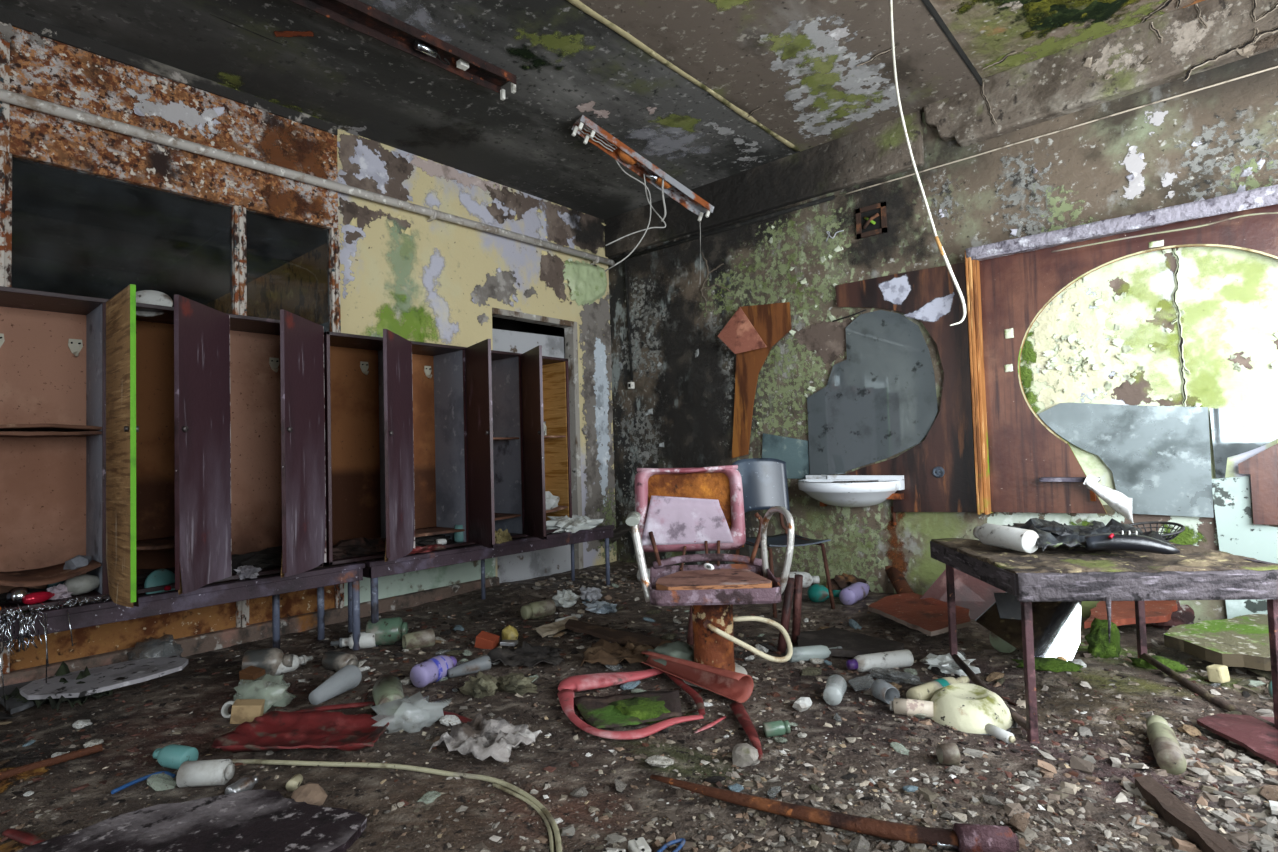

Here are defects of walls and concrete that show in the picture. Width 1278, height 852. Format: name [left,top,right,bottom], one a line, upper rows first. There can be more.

crack [1141,0,1278,81]
peeling [197,107,225,129]
corrosion [253,125,335,220]
peeling [337,134,676,563]
leakage [569,208,791,468]